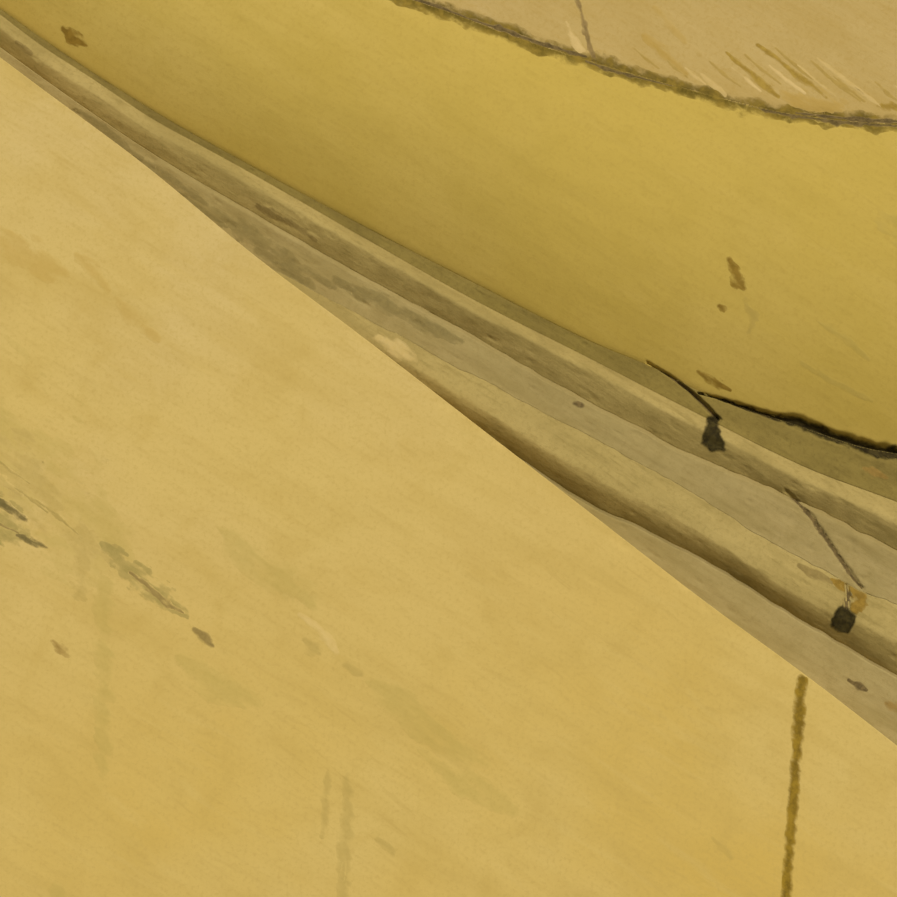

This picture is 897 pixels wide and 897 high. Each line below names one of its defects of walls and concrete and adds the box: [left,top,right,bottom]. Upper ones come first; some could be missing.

spalling [565,21,586,53]
crack [389,0,897,136]
peeling [633,43,897,114]
crack [660,371,897,458]
damp [0,396,136,781]
crack [787,496,864,611]
corrosion [796,563,869,615]